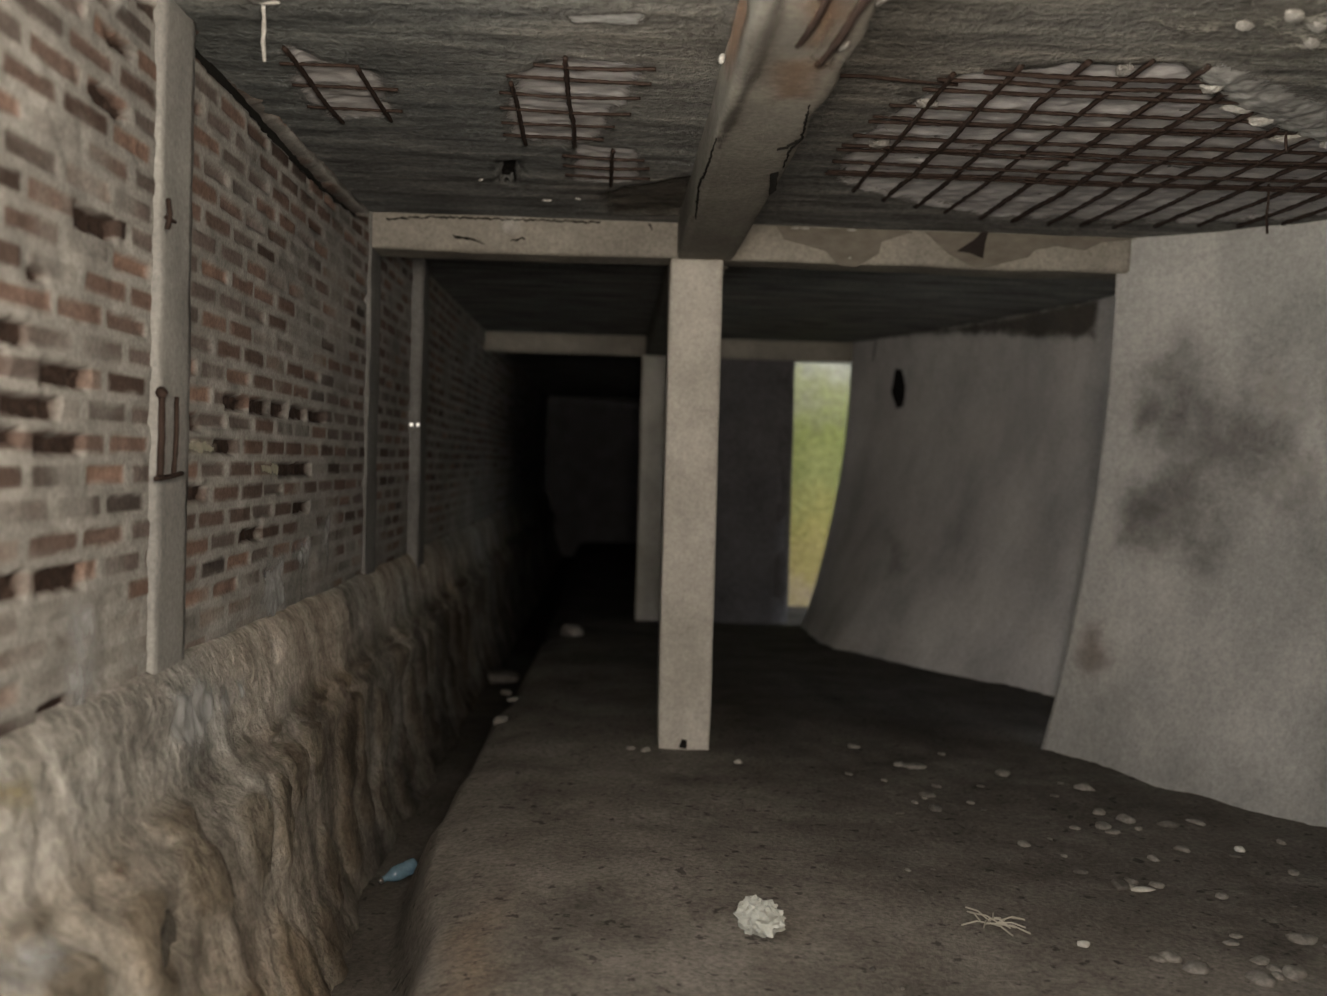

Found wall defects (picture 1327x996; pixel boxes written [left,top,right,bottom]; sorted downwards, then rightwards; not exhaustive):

spalling [287,47,395,118]
spalling [506,58,690,215]
spalling [777,0,1327,269]